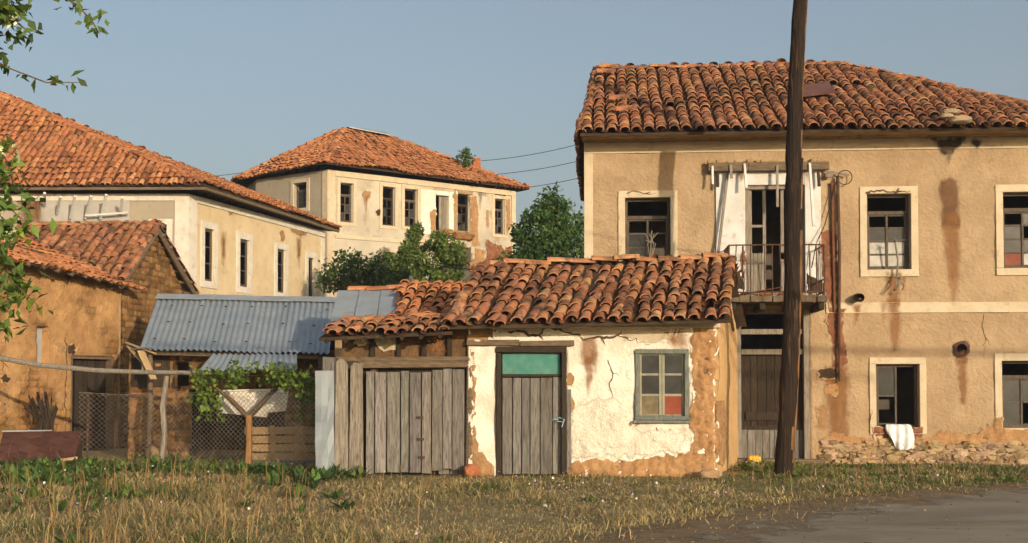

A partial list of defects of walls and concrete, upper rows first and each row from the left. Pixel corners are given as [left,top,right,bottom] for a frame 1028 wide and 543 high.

water stain [931,137,981,160]
water stain [940,178,960,291]
flaking render [466,328,545,477]
crack [508,328,649,396]
water stain [583,339,596,385]
flaking render [561,328,719,478]